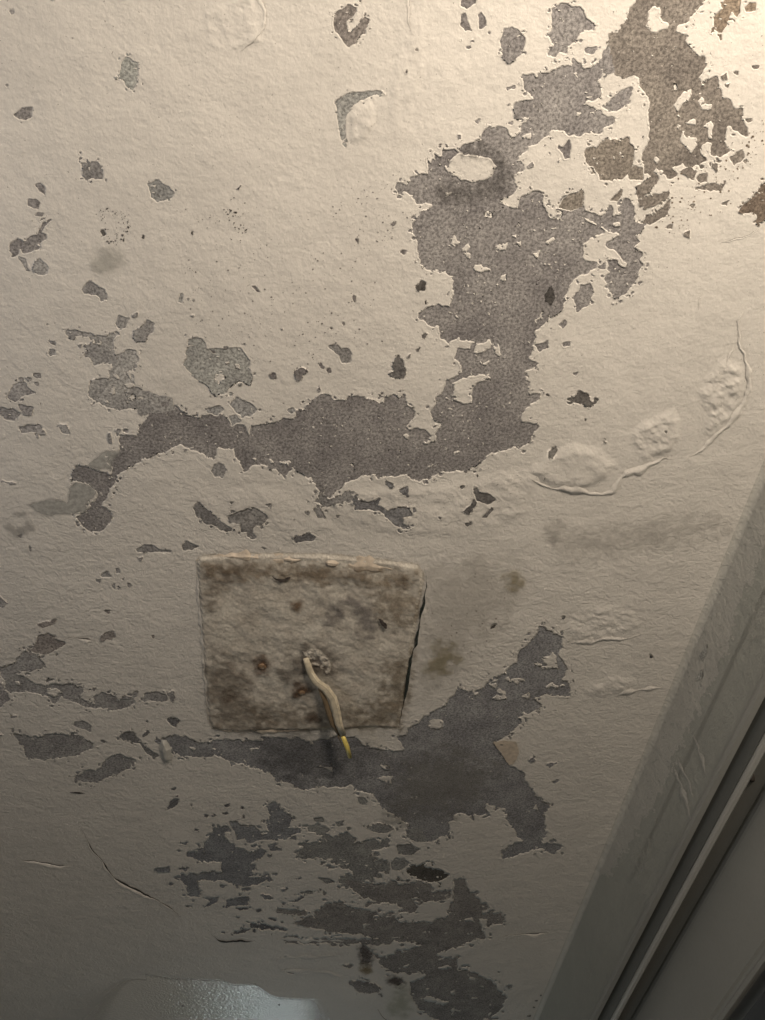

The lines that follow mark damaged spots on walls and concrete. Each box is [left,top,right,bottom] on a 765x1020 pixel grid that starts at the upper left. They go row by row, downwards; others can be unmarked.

peeling [12,105,35,122]
peeling [7,181,53,277]
peeling [46,0,765,536]
peeling [135,539,200,563]
peeling [191,500,273,551]
peeling [291,531,317,545]
peeling [0,615,577,1020]
crack [20,860,71,870]
crack [80,828,179,916]
crack [216,936,252,944]